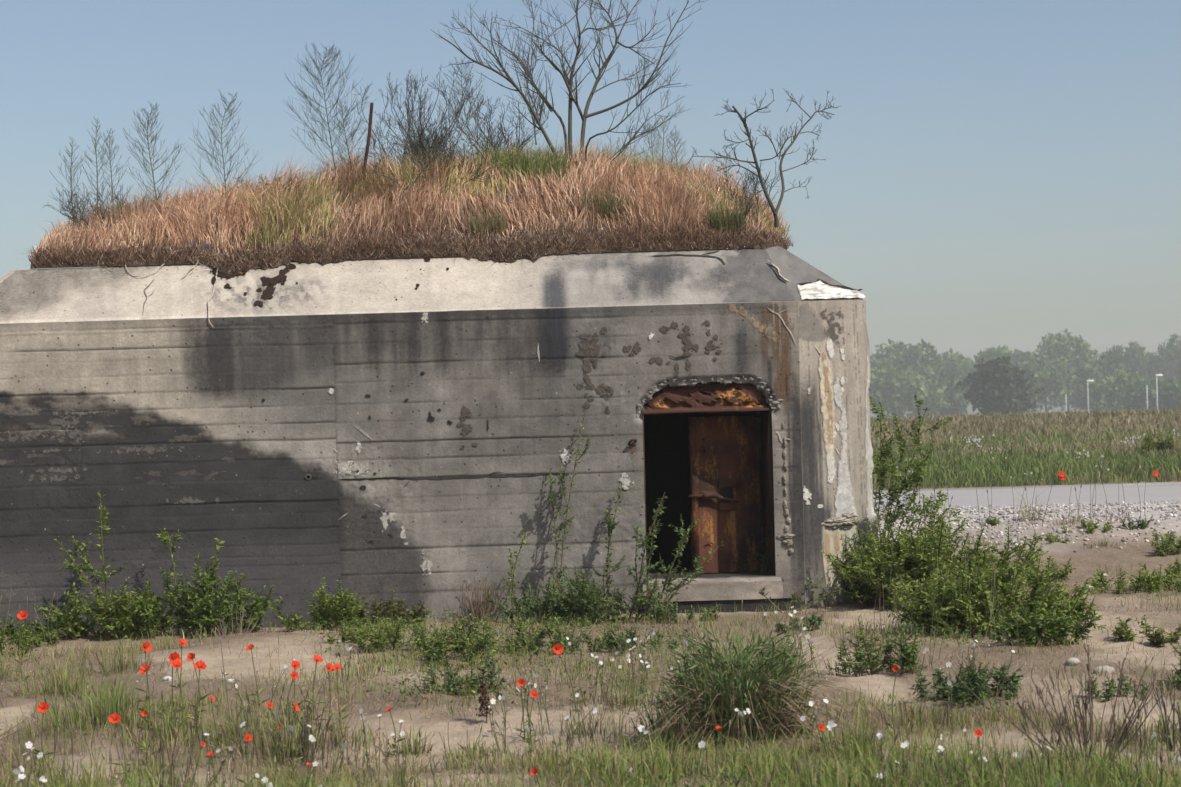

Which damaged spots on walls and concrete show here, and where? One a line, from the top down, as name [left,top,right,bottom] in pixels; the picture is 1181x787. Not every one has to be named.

water stain [187,277,567,392]
peeling [575,327,614,413]
peeling [623,320,776,414]
rust [715,388,761,407]
rust [728,304,791,407]
spalling [798,279,865,342]
water stain [0,391,423,636]